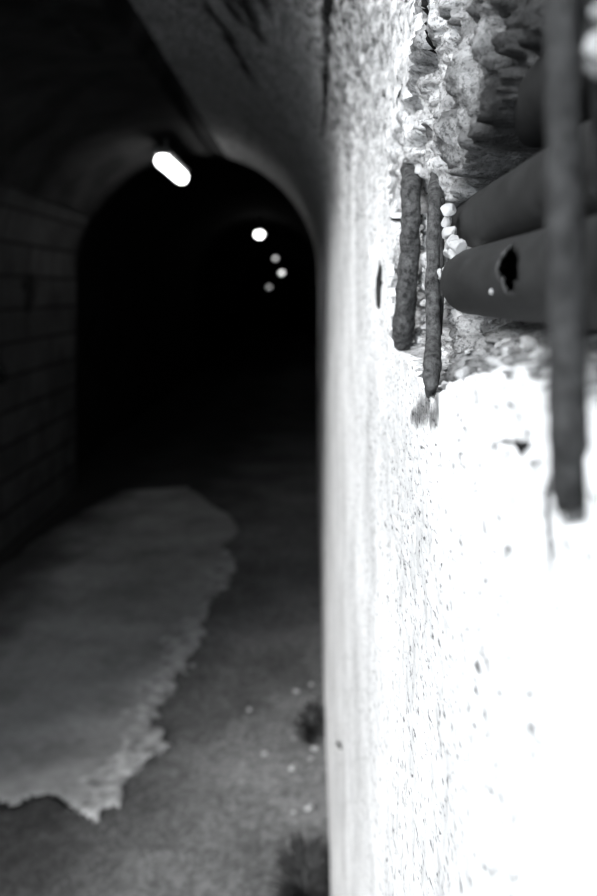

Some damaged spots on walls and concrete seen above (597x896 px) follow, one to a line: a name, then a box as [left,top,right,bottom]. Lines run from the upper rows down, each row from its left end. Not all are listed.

spalling [376,0,597,514]
corrosion [565,501,586,525]